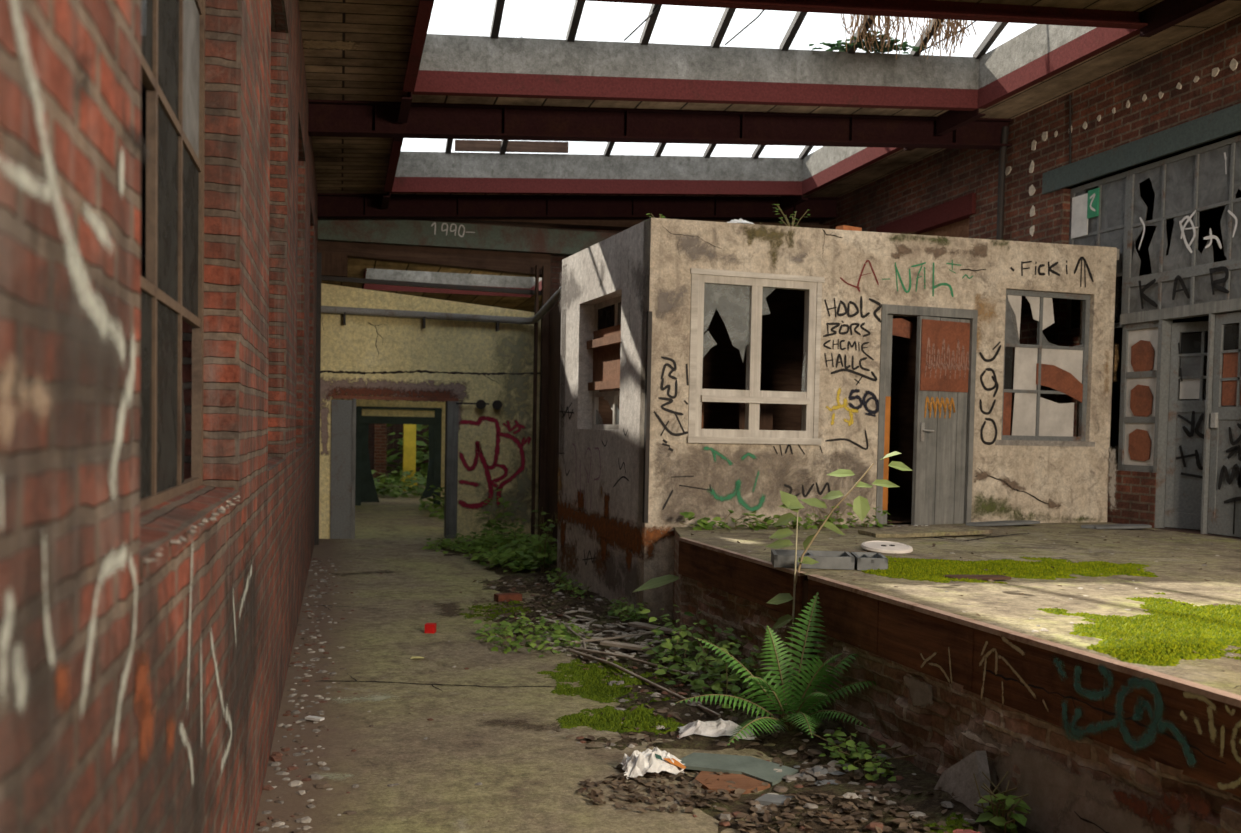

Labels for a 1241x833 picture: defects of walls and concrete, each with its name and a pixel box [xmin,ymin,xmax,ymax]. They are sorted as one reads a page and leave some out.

water stain [681,236,734,261]
water stain [744,226,805,267]
water stain [632,264,687,323]
crack [975,468,1061,512]
crack [933,533,1029,541]